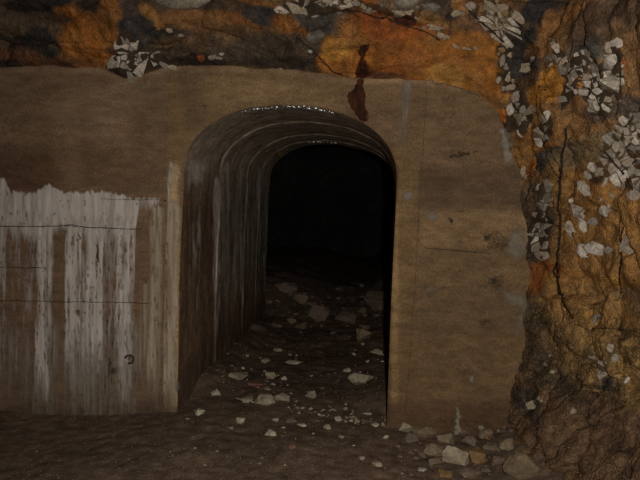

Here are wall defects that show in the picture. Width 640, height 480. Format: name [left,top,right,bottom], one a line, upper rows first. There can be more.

corrosion [348,44,372,122]
water stain [0,162,180,413]